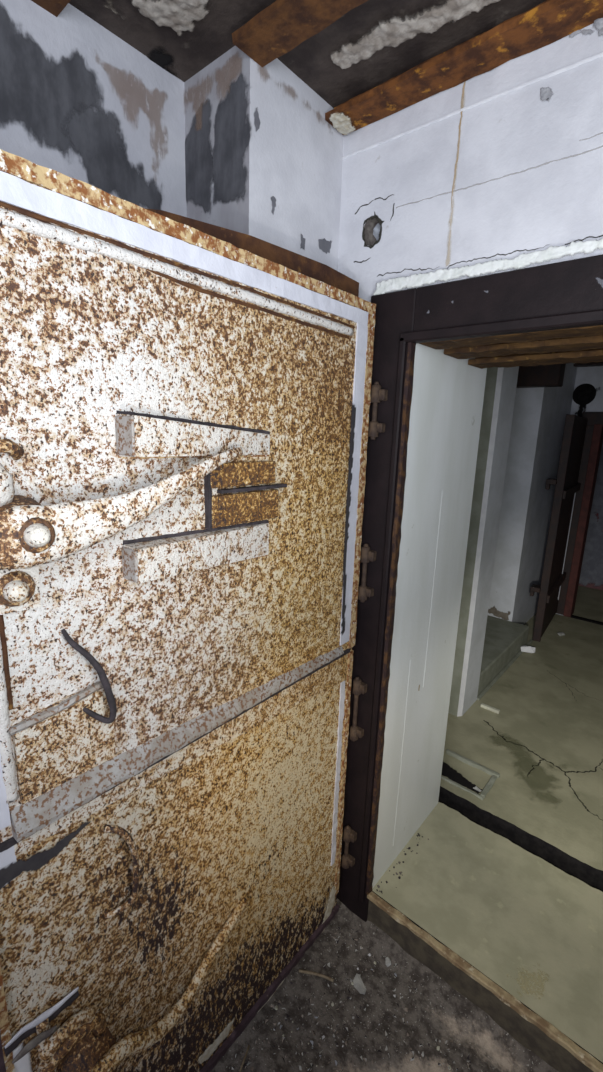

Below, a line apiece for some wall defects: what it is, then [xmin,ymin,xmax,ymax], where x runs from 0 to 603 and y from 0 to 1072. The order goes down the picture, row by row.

corrosion [451,81,466,208]
hole [354,194,395,263]
crack [483,720,603,820]